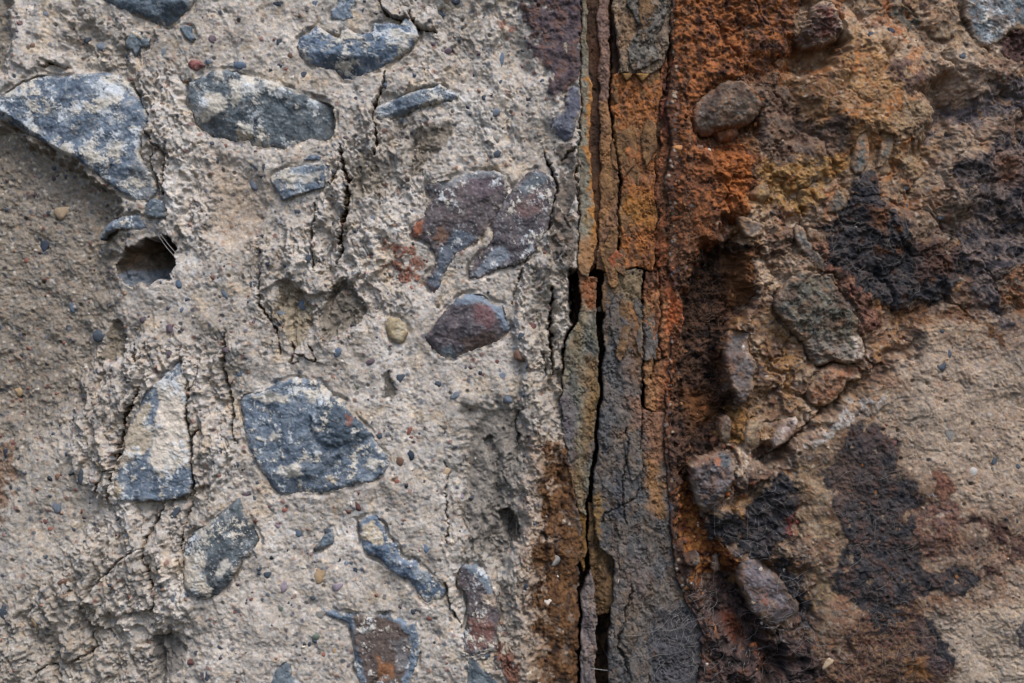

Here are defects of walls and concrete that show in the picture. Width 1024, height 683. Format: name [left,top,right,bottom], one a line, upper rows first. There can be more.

crack [328,151,352,257]
crack [372,73,385,156]
crack [544,119,581,205]
corrosion [500,0,1024,683]
crack [94,394,138,492]
efflorescence [803,396,887,447]
crack [65,513,161,610]